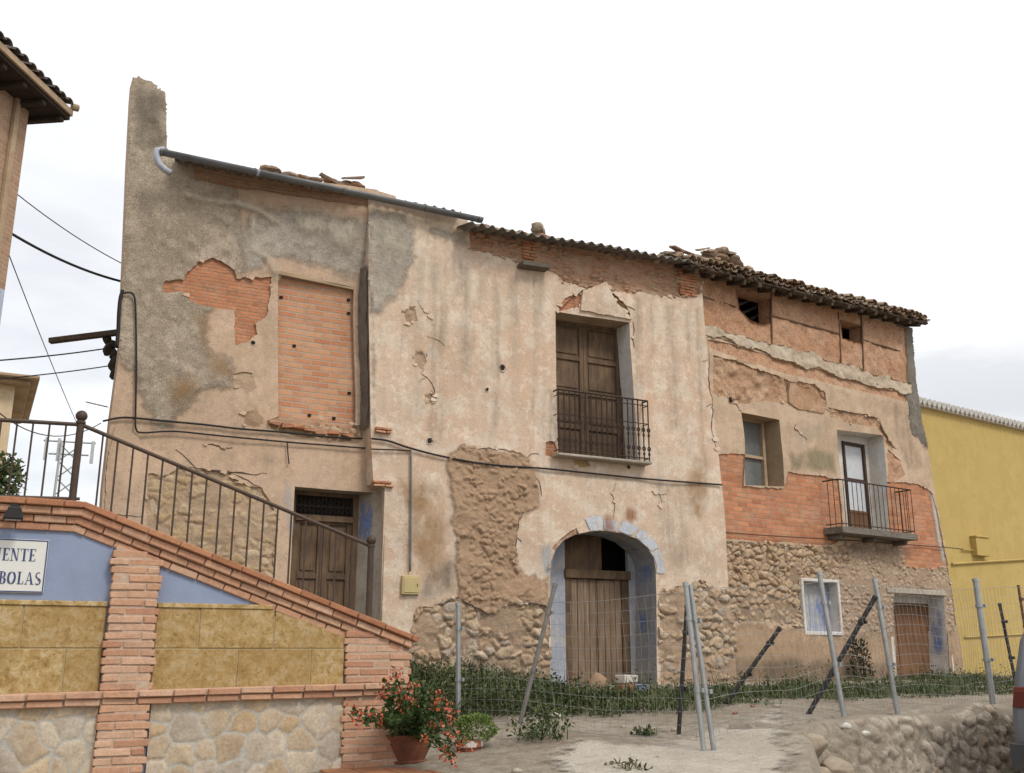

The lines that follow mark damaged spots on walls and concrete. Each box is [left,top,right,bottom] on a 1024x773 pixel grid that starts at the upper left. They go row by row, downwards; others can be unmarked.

flaking render [119,76,368,428]
spalling [468,224,704,314]
crack [177,443,267,487]
crack [703,337,789,451]
flaking render [706,335,948,570]
crack [828,410,897,448]
flaking render [145,468,280,580]
flaking render [447,444,551,614]